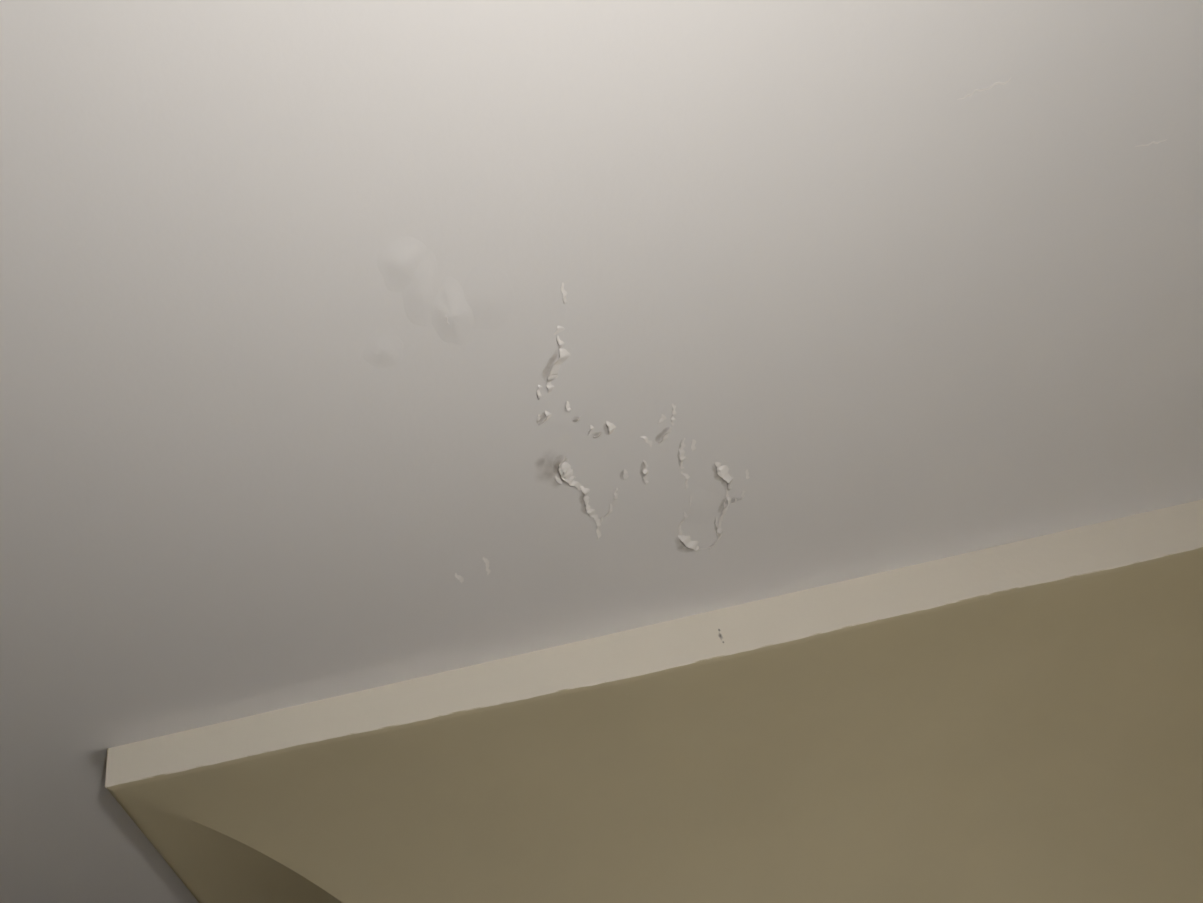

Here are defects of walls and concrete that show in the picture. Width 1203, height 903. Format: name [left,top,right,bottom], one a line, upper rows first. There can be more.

peeling [555,456,603,541]